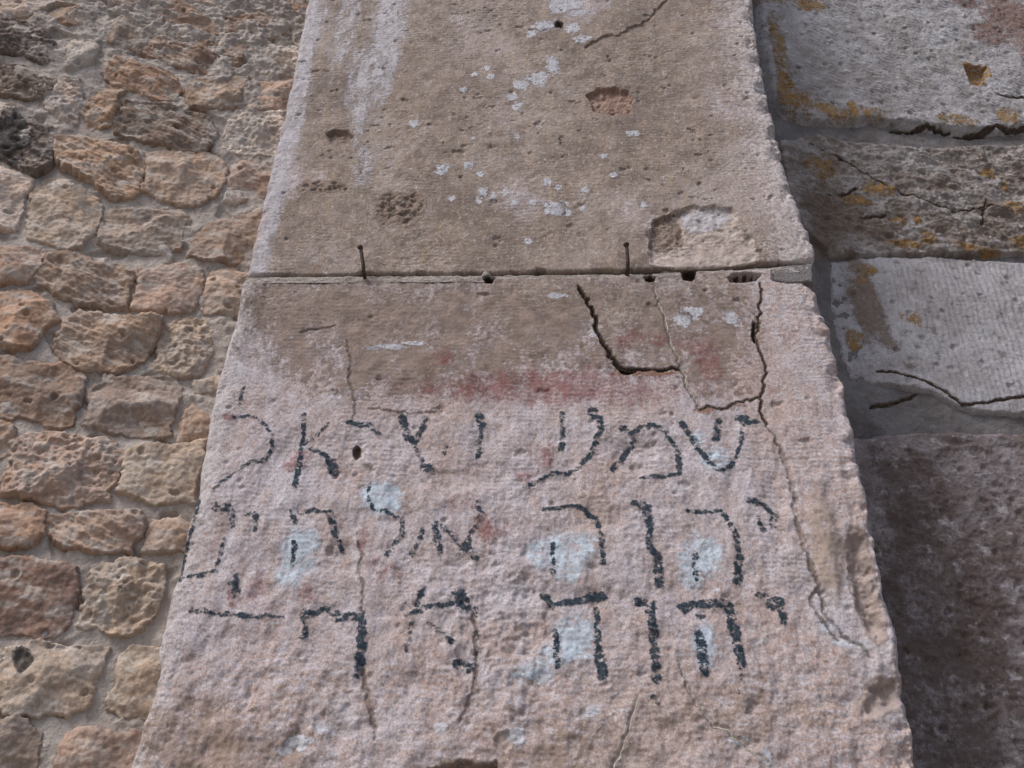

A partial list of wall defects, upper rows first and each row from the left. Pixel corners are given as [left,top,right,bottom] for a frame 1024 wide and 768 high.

spalling [586,86,635,116]
crack [889,123,1024,141]
crack [810,143,994,227]
spalling [646,202,759,272]
crack [577,282,768,425]
crack [869,370,1024,409]